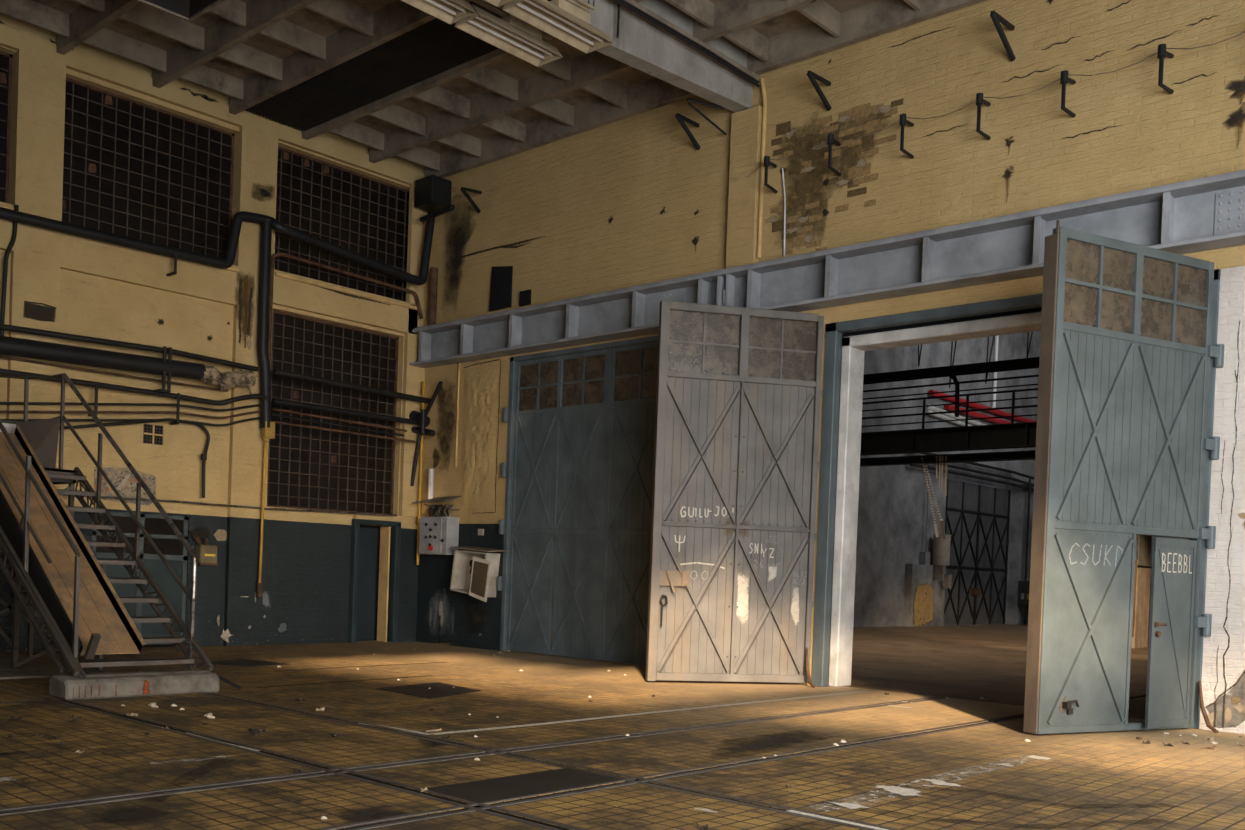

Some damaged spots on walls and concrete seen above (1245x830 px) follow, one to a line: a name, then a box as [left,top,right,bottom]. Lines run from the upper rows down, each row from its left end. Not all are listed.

crack [887,26,955,48]
crack [1004,15,1219,82]
crack [1174,72,1216,84]
crack [1062,125,1122,139]
flaking render [767,98,904,255]
crack [1214,321,1240,699]
flaking render [1205,670,1245,728]